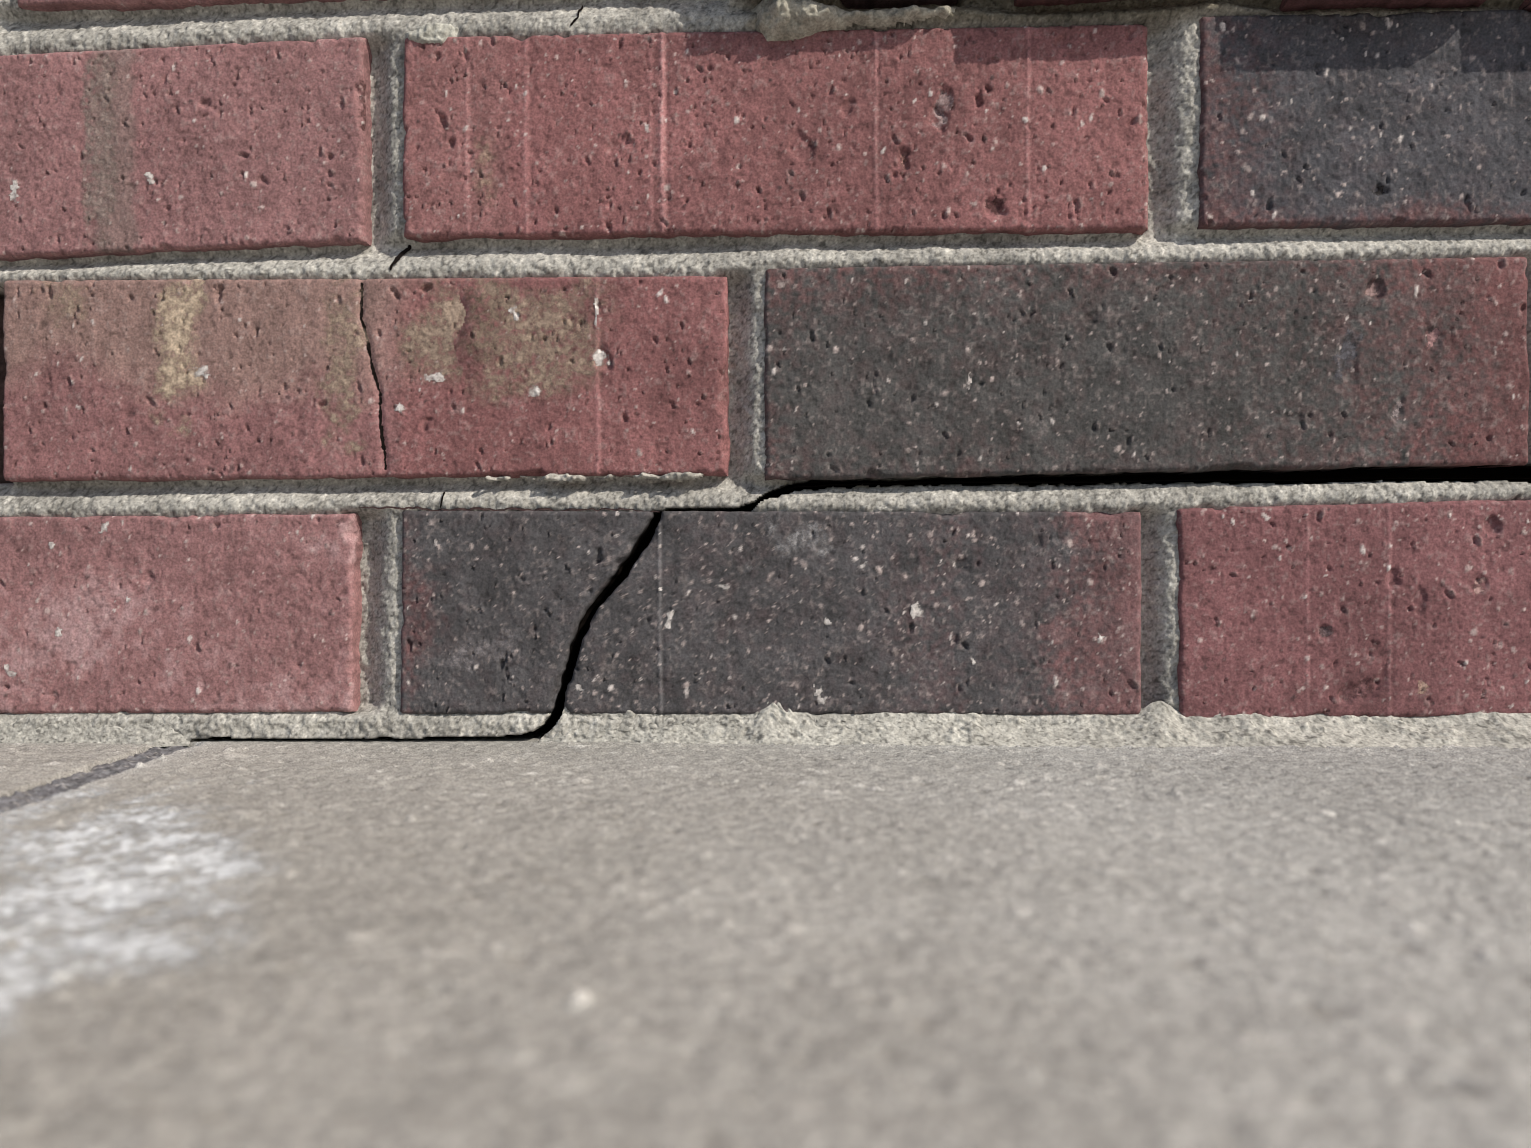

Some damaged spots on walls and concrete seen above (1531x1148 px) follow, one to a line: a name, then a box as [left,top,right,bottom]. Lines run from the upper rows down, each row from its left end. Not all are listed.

crack [359,245,411,470]
crack [359,465,1531,738]